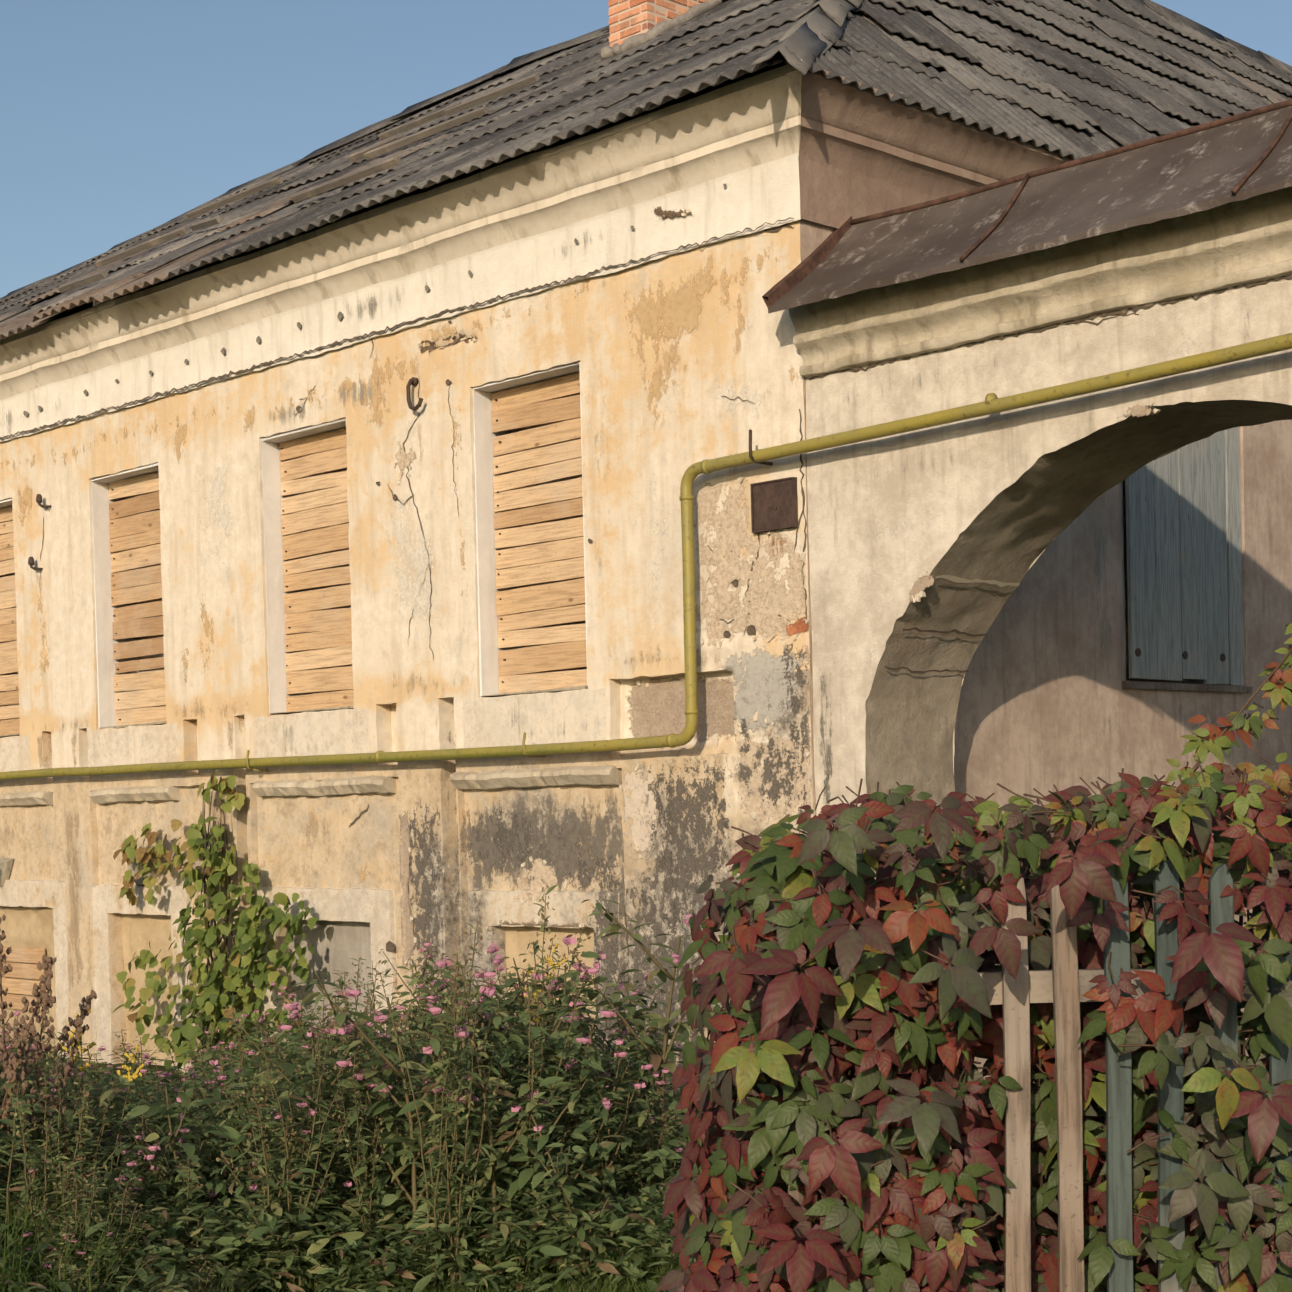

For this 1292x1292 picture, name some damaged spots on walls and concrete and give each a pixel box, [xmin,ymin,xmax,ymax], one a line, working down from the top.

peeling [245,406,255,432]
peeling [274,309,511,424]
crack [0,217,794,440]
crack [388,384,459,658]
peeling [624,249,769,420]
flaking render [625,477,811,823]
water stain [406,805,444,1010]
water stain [457,644,832,1095]